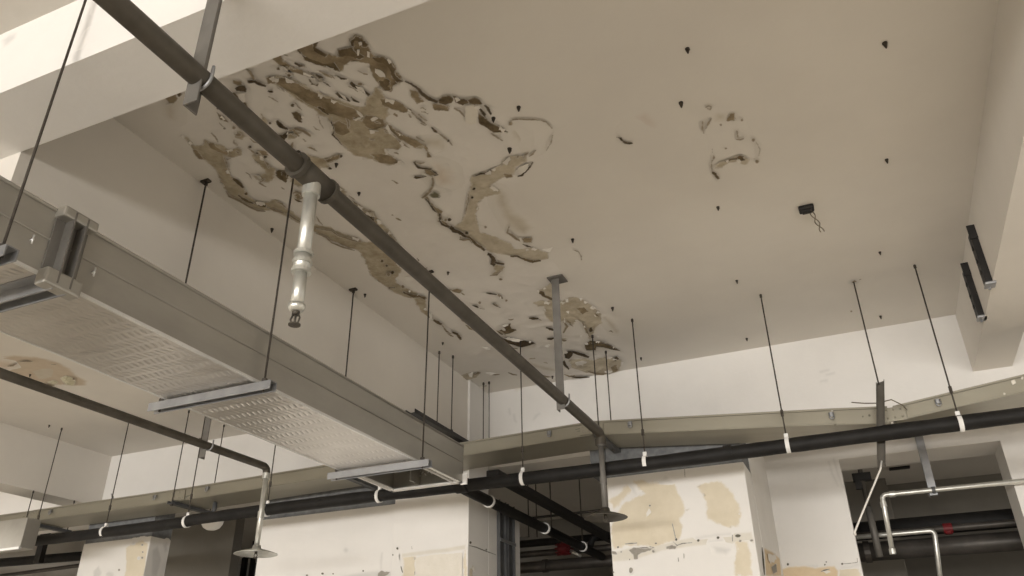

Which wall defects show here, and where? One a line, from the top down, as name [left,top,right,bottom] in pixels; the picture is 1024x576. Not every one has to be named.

peeling [134,91,303,242]
peeling [218,21,645,389]
peeling [701,105,761,179]
leakage [0,353,94,388]
peeling [605,443,746,462]
peeling [607,458,863,576]